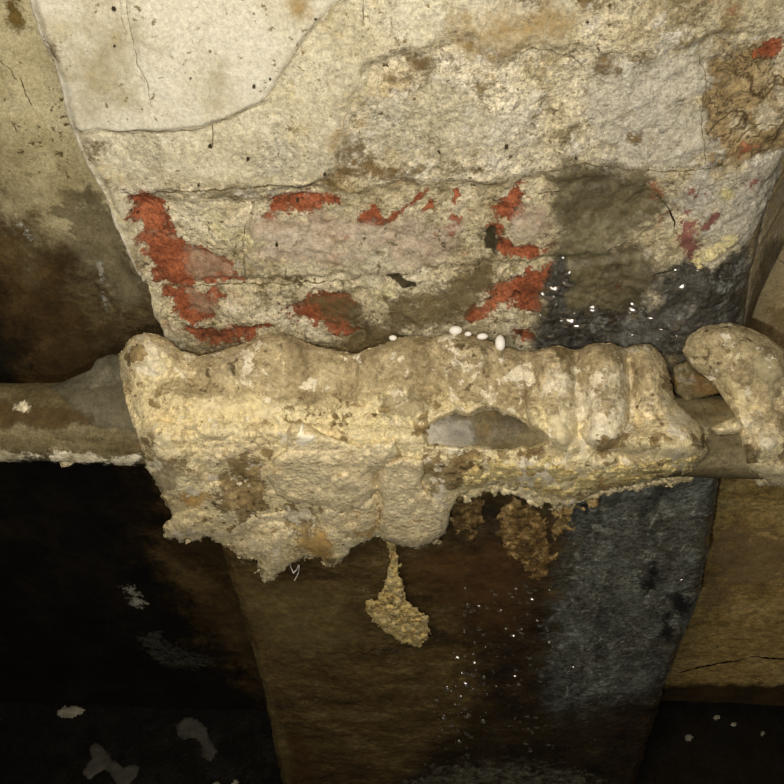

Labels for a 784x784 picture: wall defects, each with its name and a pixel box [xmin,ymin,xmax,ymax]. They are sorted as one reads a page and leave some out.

flaking render [79,0,784,356]
leakage [579,39,725,178]
leakage [0,151,784,711]
leakage [409,477,784,784]
crack [679,656,784,673]